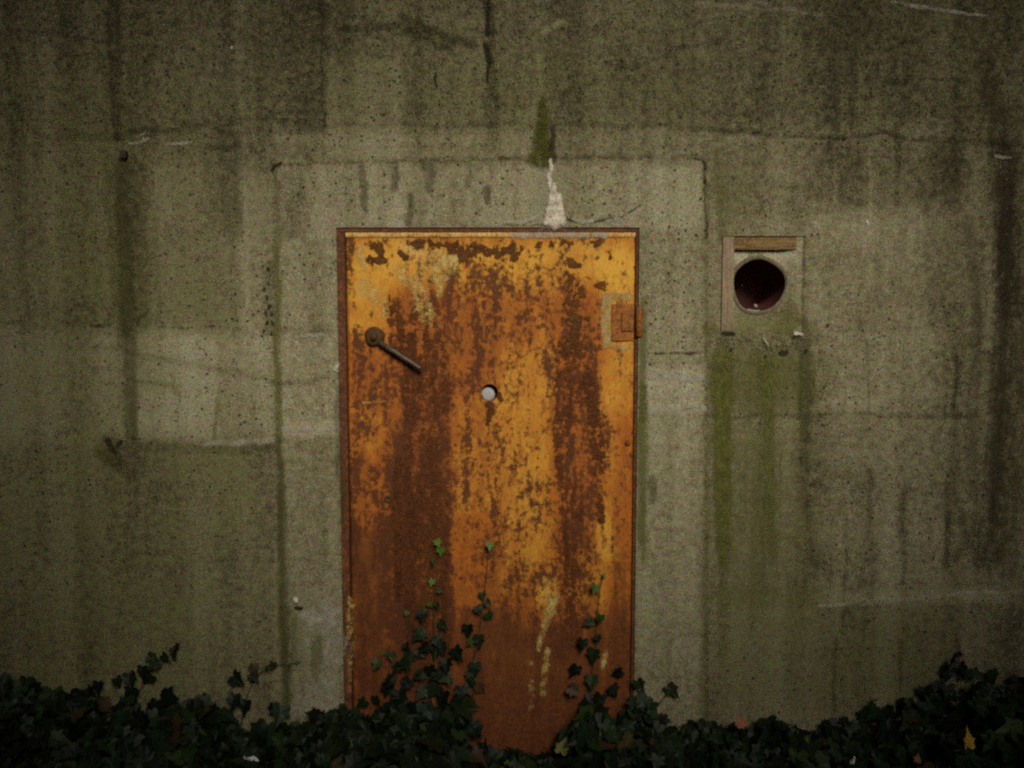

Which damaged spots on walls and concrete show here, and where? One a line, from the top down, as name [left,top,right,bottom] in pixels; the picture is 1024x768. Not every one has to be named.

water stain [511,123,608,238]
rust [590,236,613,260]
rust [364,238,609,689]
water stain [639,336,734,567]